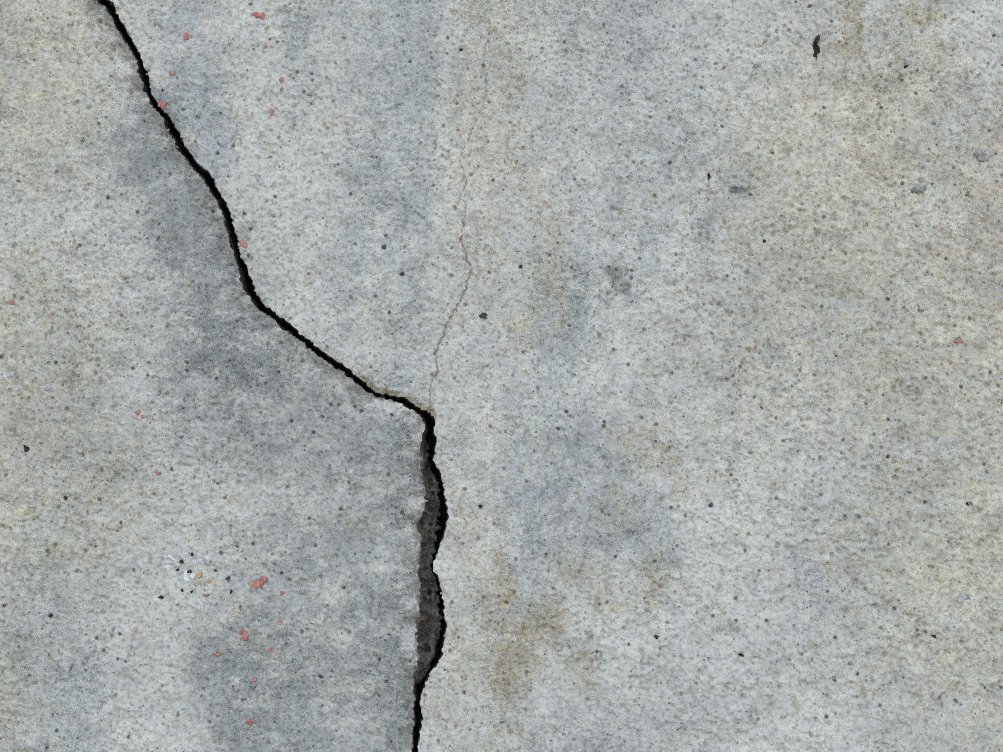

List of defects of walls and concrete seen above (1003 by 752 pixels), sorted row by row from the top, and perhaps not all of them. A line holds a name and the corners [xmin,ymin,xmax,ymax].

crack [89,0,491,752]